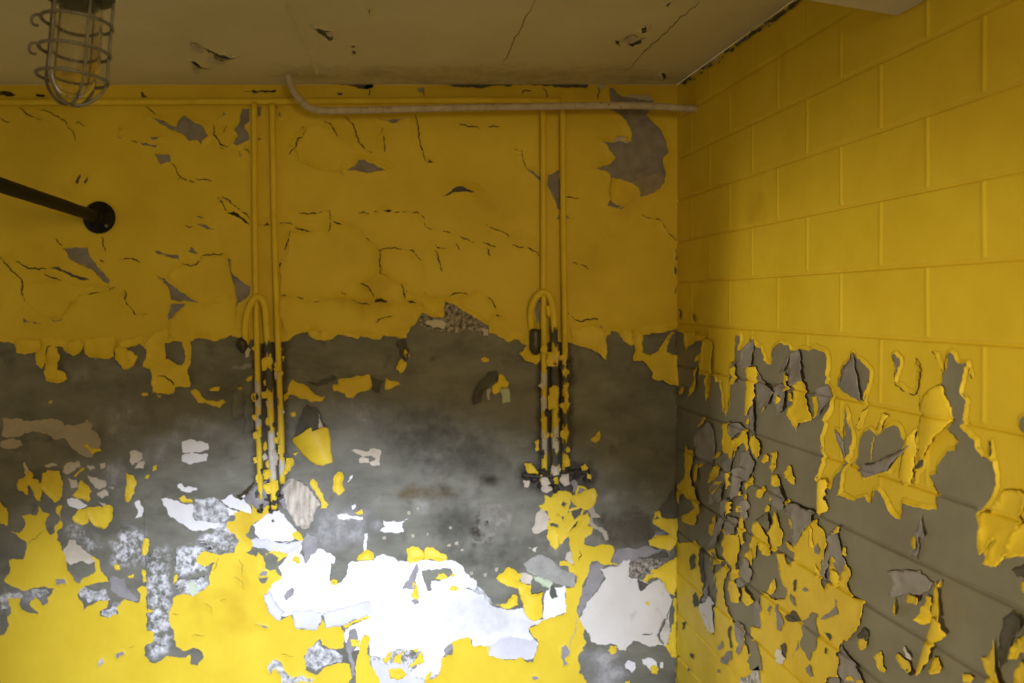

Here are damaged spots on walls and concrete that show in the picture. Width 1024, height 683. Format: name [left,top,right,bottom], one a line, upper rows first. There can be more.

peeling [141,90,286,161]
crack [287,116,386,173]
peeling [449,85,674,223]
crack [178,177,539,335]
peeling [0,251,1024,683]